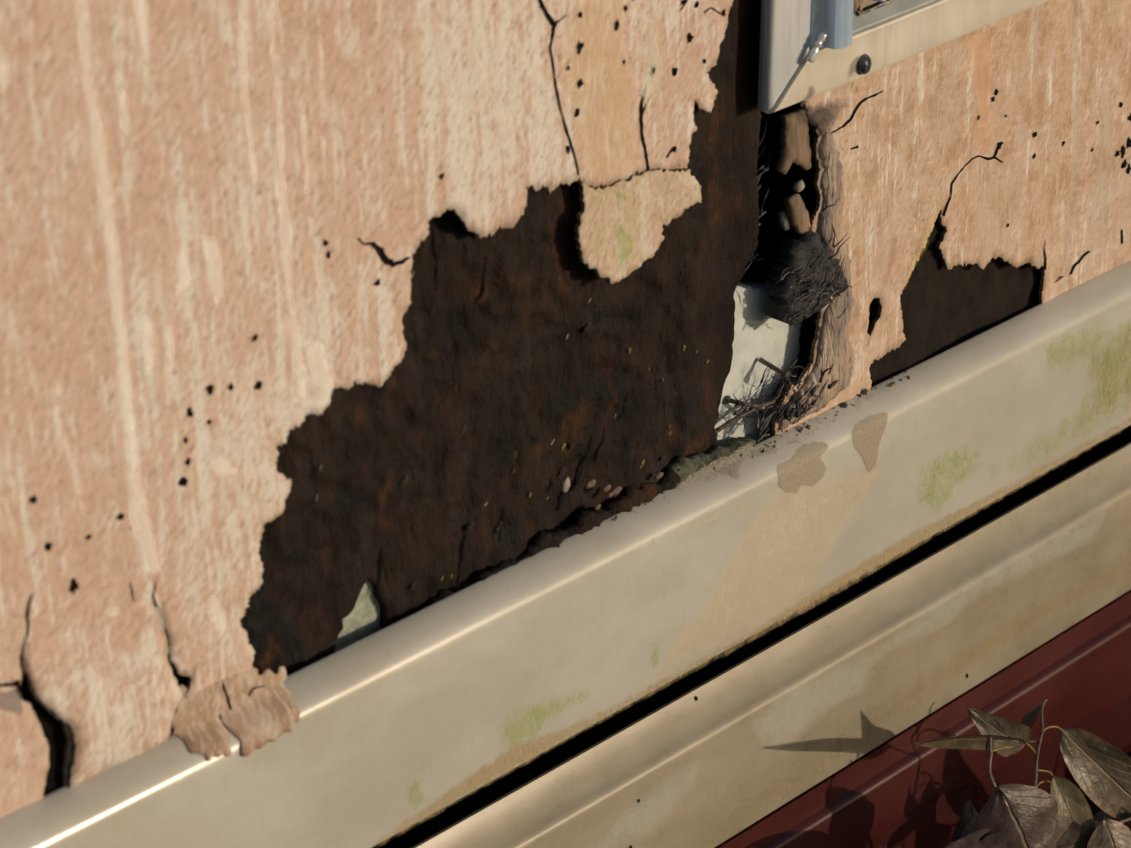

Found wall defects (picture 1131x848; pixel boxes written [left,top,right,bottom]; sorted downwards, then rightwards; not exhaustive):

crack [539,0,580,176]
crack [640,86,675,170]
crack [831,91,883,149]
crack [943,141,1003,216]
crack [358,238,410,267]
peeling [574,168,701,284]
crack [26,593,34,639]
crack [0,680,65,797]